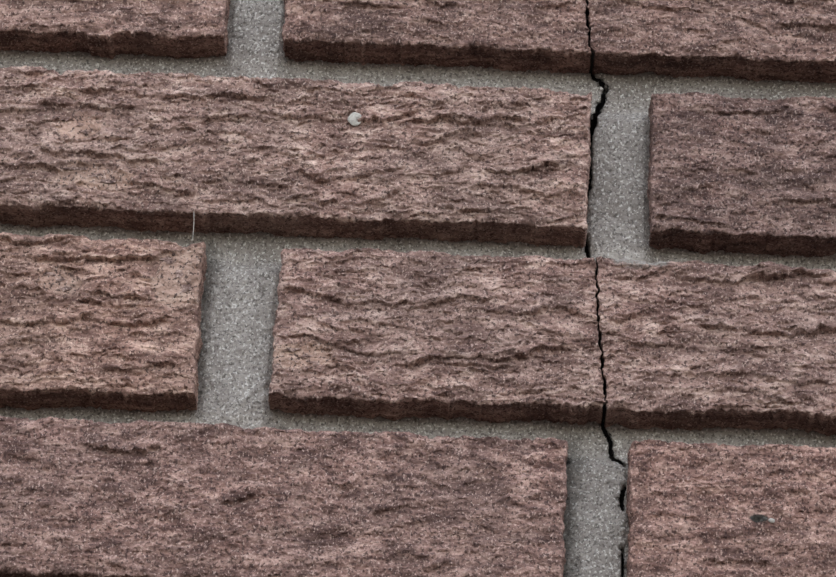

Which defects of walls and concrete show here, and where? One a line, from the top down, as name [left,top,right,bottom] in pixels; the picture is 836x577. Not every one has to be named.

crack [585,0,608,208]
crack [585,242,624,465]
crack [618,549,626,577]
crack [619,487,627,511]